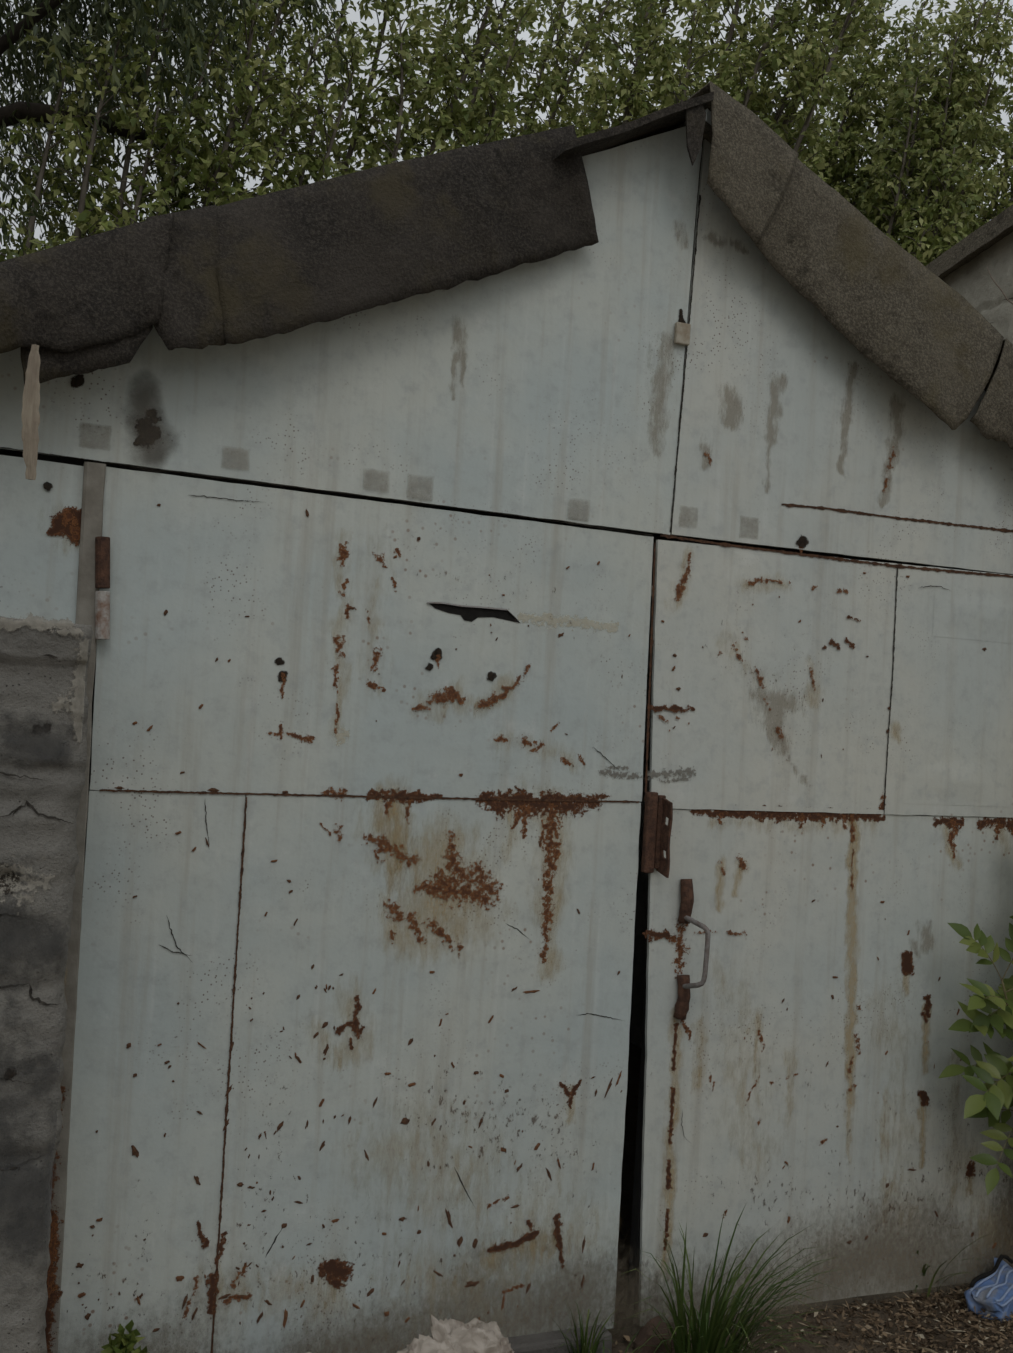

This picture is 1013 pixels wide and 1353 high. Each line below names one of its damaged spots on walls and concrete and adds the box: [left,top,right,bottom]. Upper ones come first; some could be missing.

corrosion [688,195,701,324]
crack [0,772,73,824]
corrosion [0,346,1013,1353]